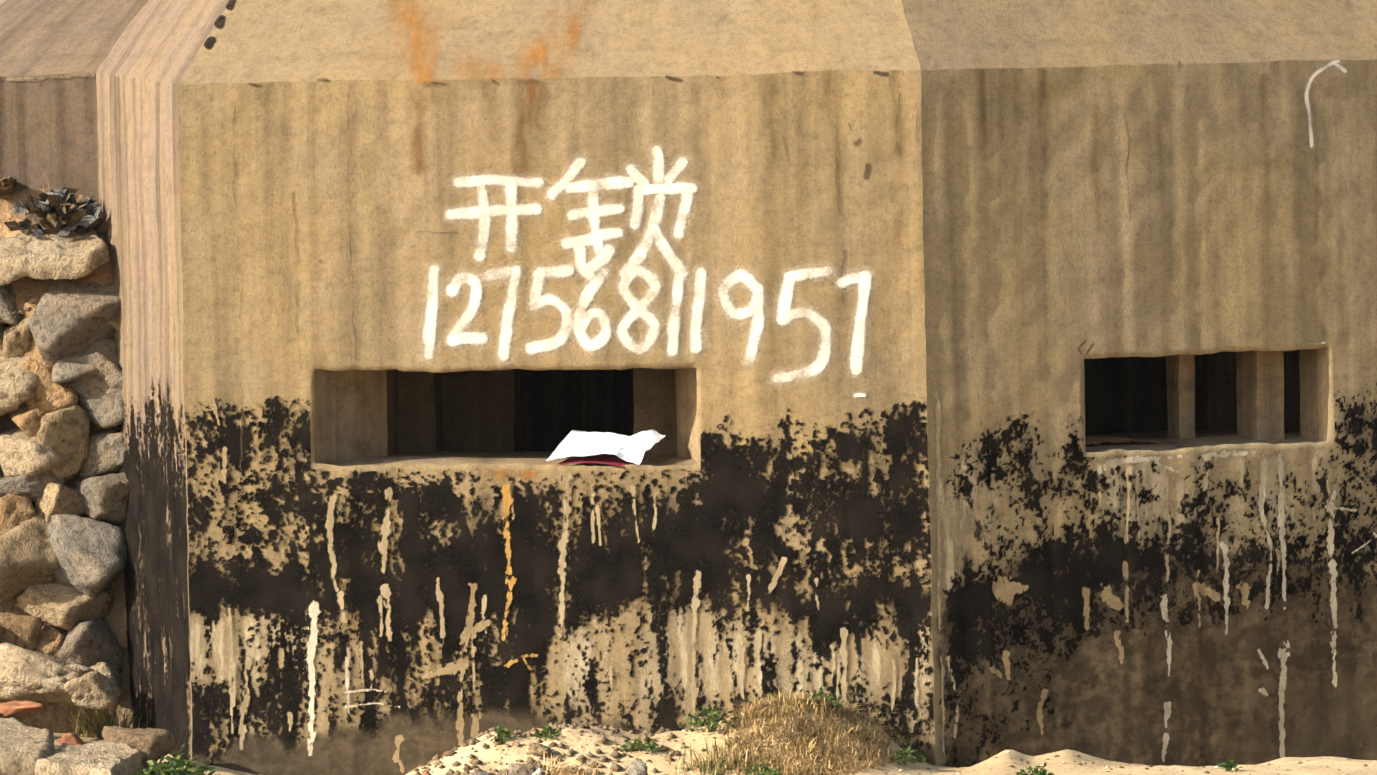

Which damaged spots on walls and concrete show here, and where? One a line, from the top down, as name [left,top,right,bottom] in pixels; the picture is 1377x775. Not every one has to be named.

water stain [112,380,1377,775]